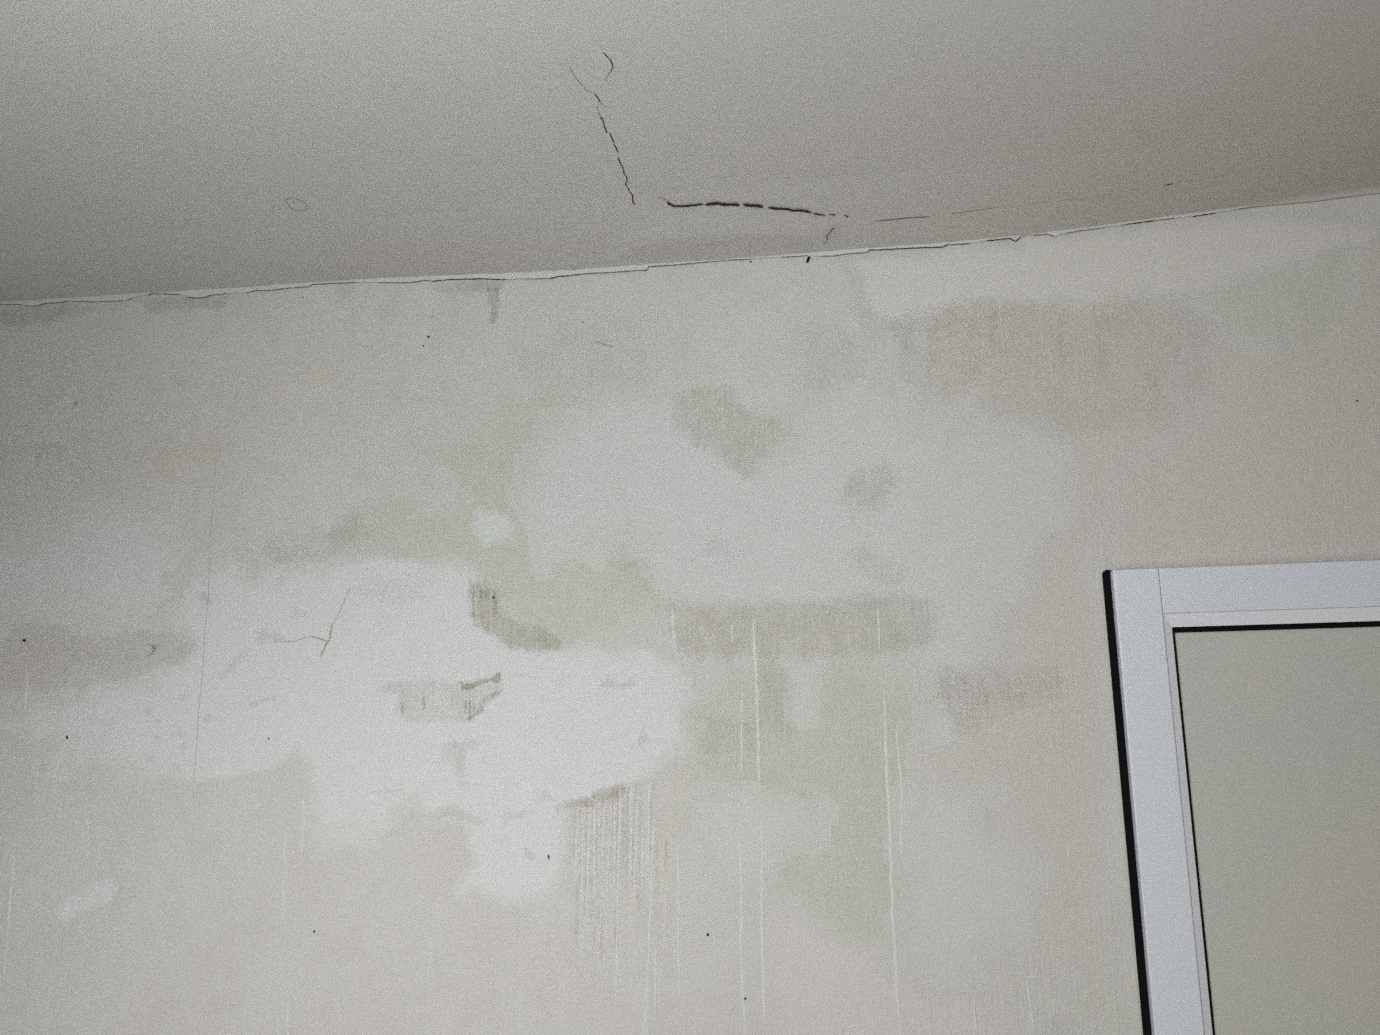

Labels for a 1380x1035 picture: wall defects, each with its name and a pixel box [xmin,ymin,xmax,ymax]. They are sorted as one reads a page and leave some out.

crack [569,53,1253,258]
crack [540,259,749,279]
crack [0,278,505,307]